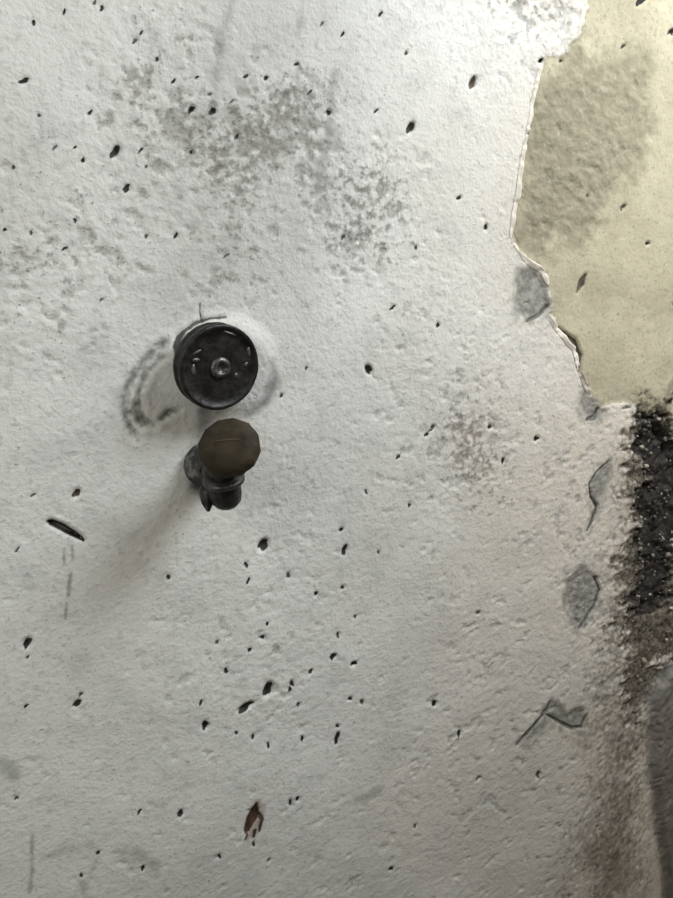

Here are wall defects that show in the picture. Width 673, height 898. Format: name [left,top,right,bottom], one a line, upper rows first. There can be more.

peeling [510,0,673,725]
corrosion [245,803,264,840]
damp [585,724,643,898]